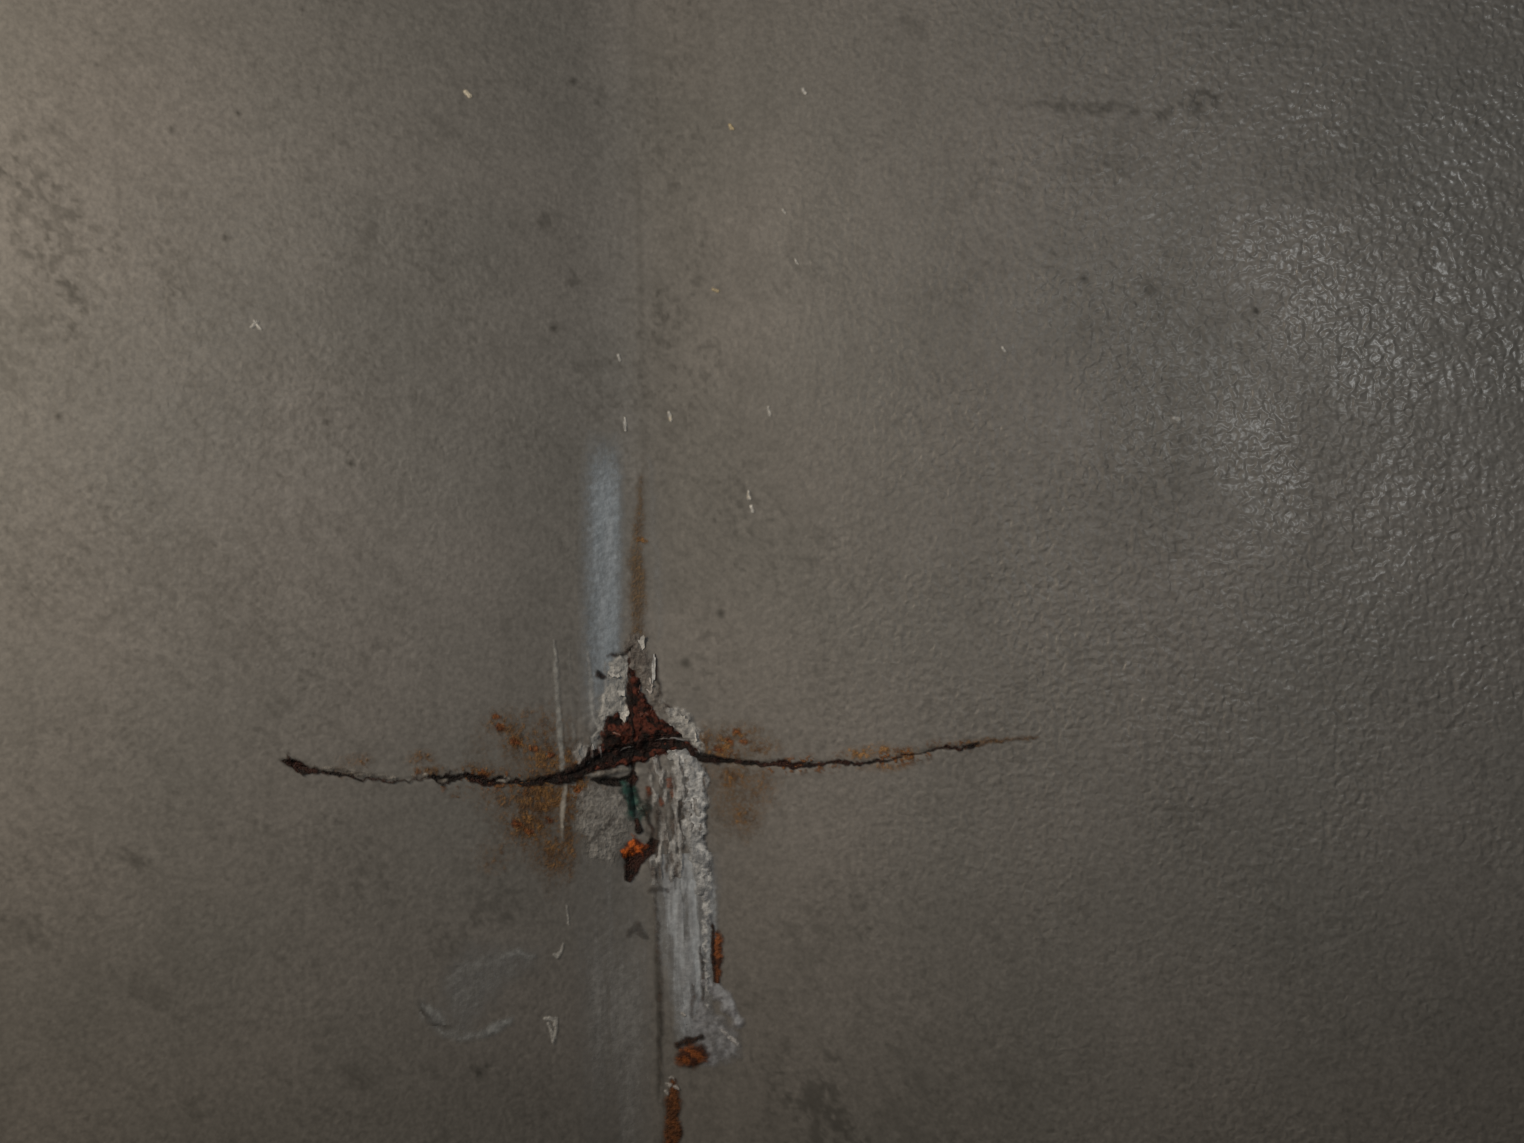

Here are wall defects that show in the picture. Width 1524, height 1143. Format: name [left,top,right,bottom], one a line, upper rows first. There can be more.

crack [282,744,638,787]
rust [463,714,596,867]
crack [625,657,633,717]
peeling [540,633,719,862]
crack [679,737,980,770]
rust [621,729,833,1143]